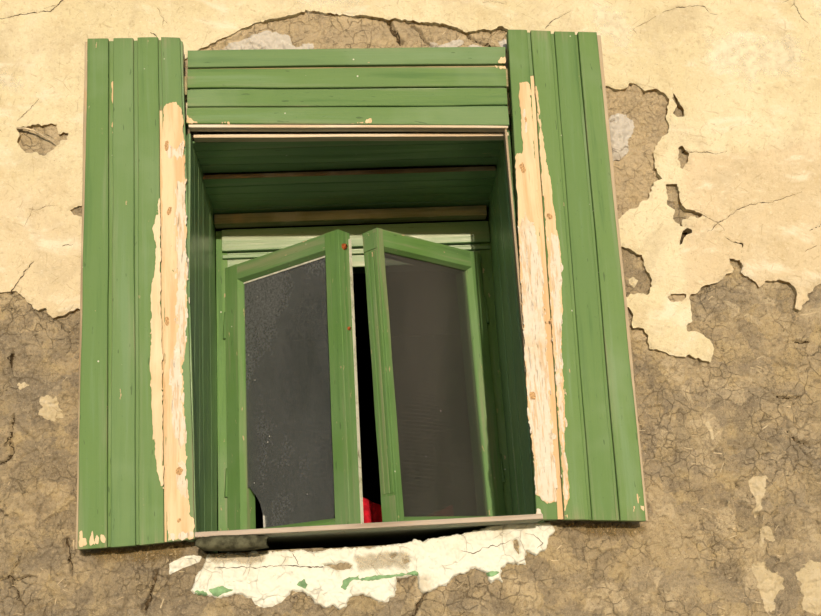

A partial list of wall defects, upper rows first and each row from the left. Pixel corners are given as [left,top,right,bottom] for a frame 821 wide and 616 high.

spalling [201,12,508,69]
spalling [17,125,68,156]
spalling [606,84,683,219]
spalling [666,186,700,233]
crack [705,192,800,247]
peeling [150,102,195,541]
peeling [515,82,570,511]
spalling [621,248,651,297]
crack [1,416,15,464]
spalling [0,260,821,616]
crack [3,556,35,601]
crack [143,572,158,610]